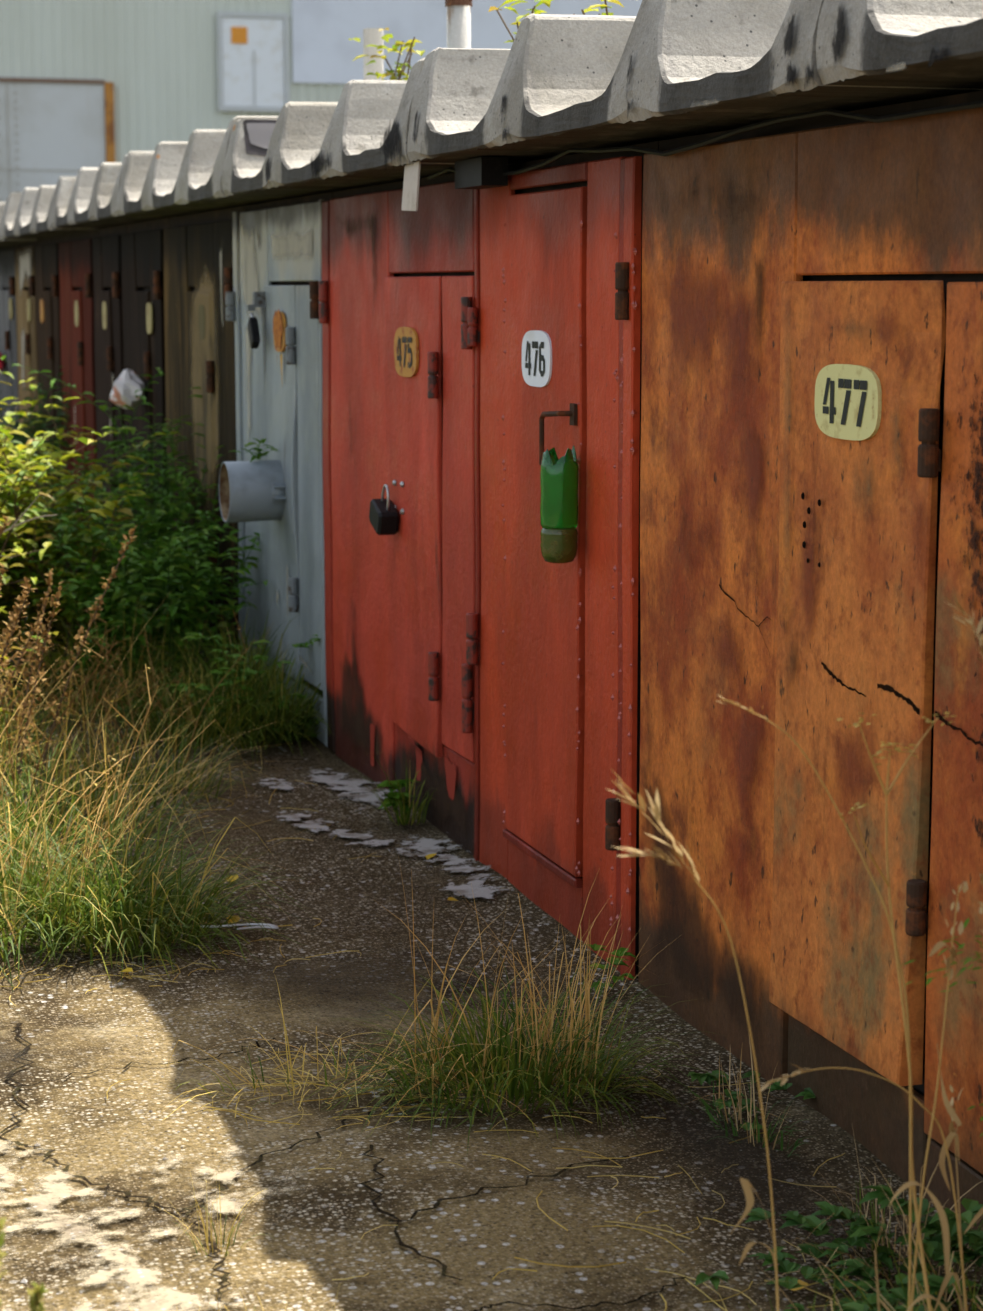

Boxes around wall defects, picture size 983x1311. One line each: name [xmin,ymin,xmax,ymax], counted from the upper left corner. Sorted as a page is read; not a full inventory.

corrosion [948,373,983,644]
crack [719,584,771,655]
crack [821,661,983,747]